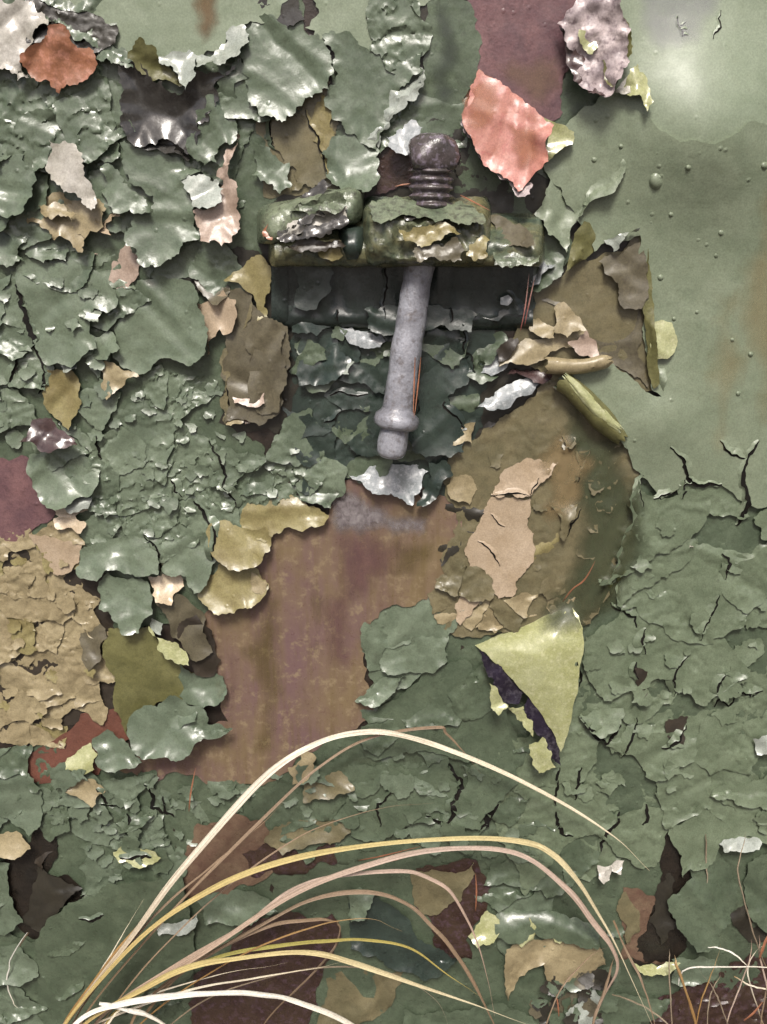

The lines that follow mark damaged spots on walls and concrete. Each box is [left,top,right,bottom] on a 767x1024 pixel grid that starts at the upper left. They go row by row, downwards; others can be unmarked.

rust [471,83,496,126]
peeling [0,0,613,1024]
peeling [257,0,767,1024]
crack [632,439,759,526]
crack [575,662,583,687]
crack [610,602,646,681]
crack [665,553,732,696]
crack [710,674,763,707]
crack [578,714,638,758]
crack [662,725,687,750]